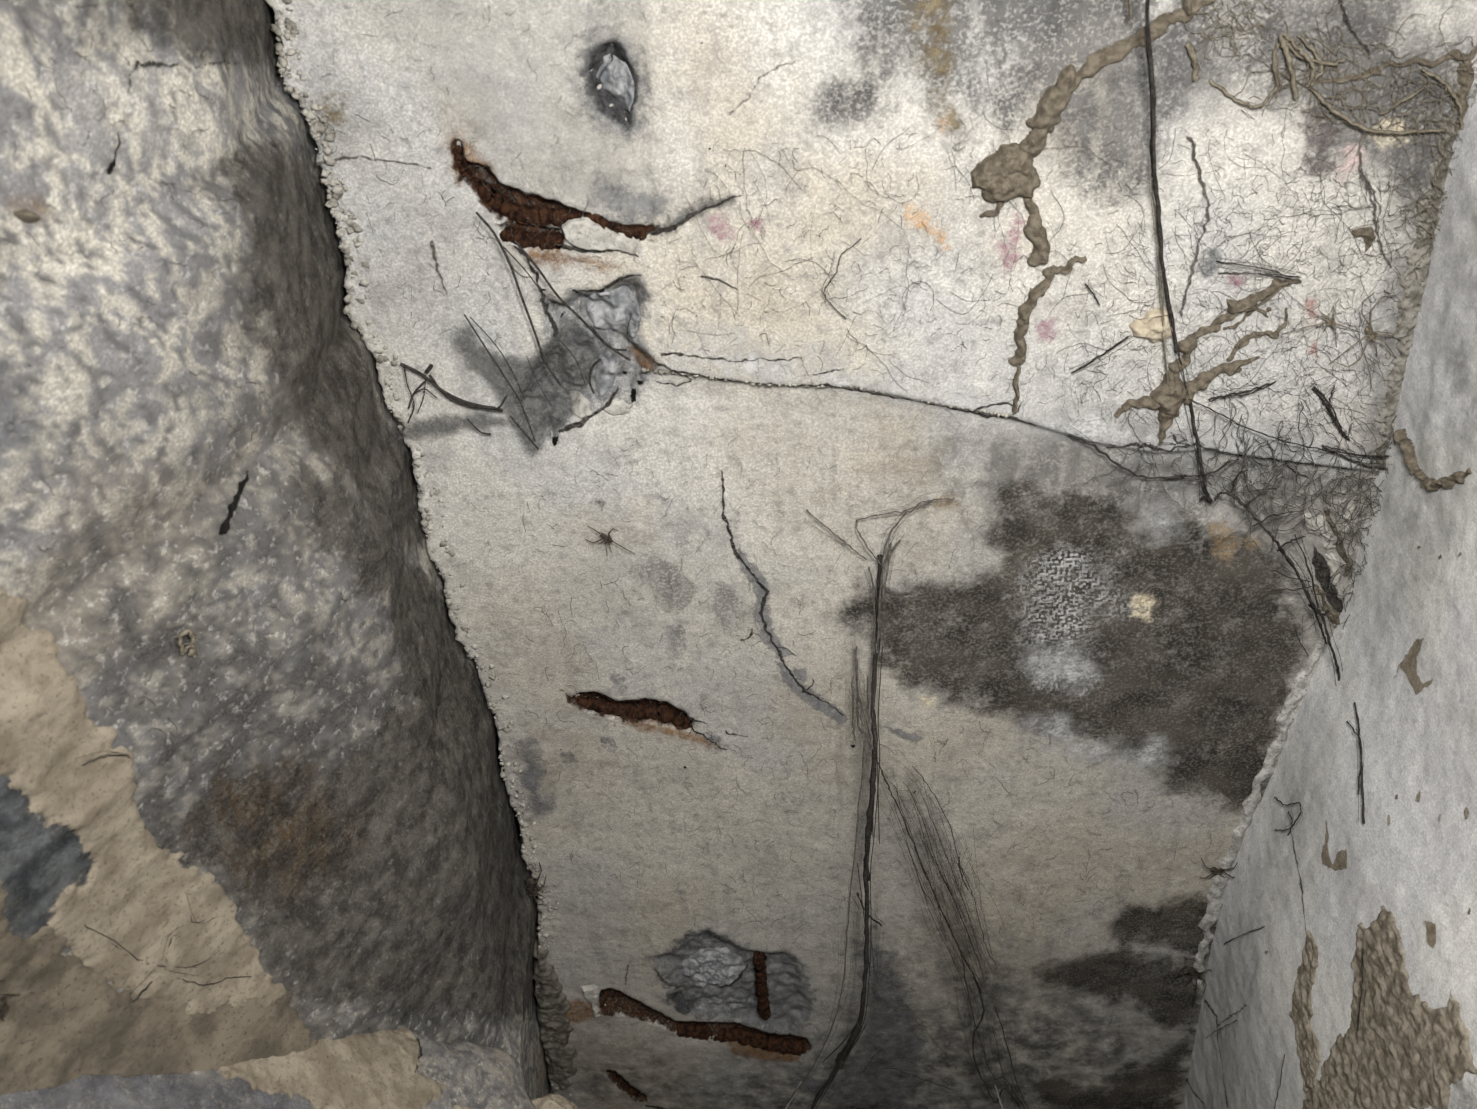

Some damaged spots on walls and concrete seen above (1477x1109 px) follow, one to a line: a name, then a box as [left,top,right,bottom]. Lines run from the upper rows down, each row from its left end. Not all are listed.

damp [820,81,873,121]
damp [858,0,1458,198]
spalling [450,139,741,446]
crack [653,352,1036,426]
crack [1180,137,1210,316]
crack [1106,432,1358,478]
crack [1358,152,1392,269]
crack [721,470,847,724]
damp [841,412,1302,811]
spalling [531,911,816,1109]
damp [1033,894,1218,1109]
flaking render [1289,905,1477,1109]